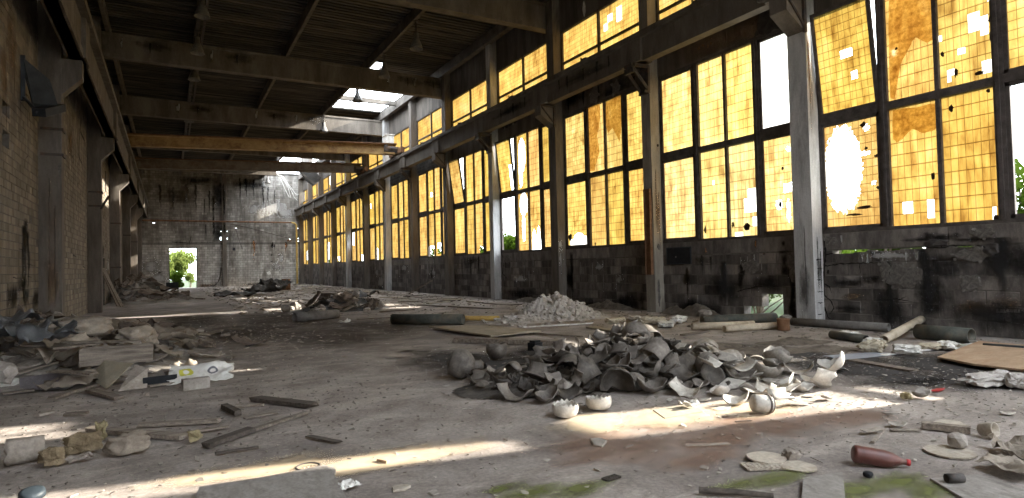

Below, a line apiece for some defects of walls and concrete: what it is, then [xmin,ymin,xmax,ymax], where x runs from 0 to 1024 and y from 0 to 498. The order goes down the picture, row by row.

water stain [239,178,289,216]
water stain [867,250,932,309]